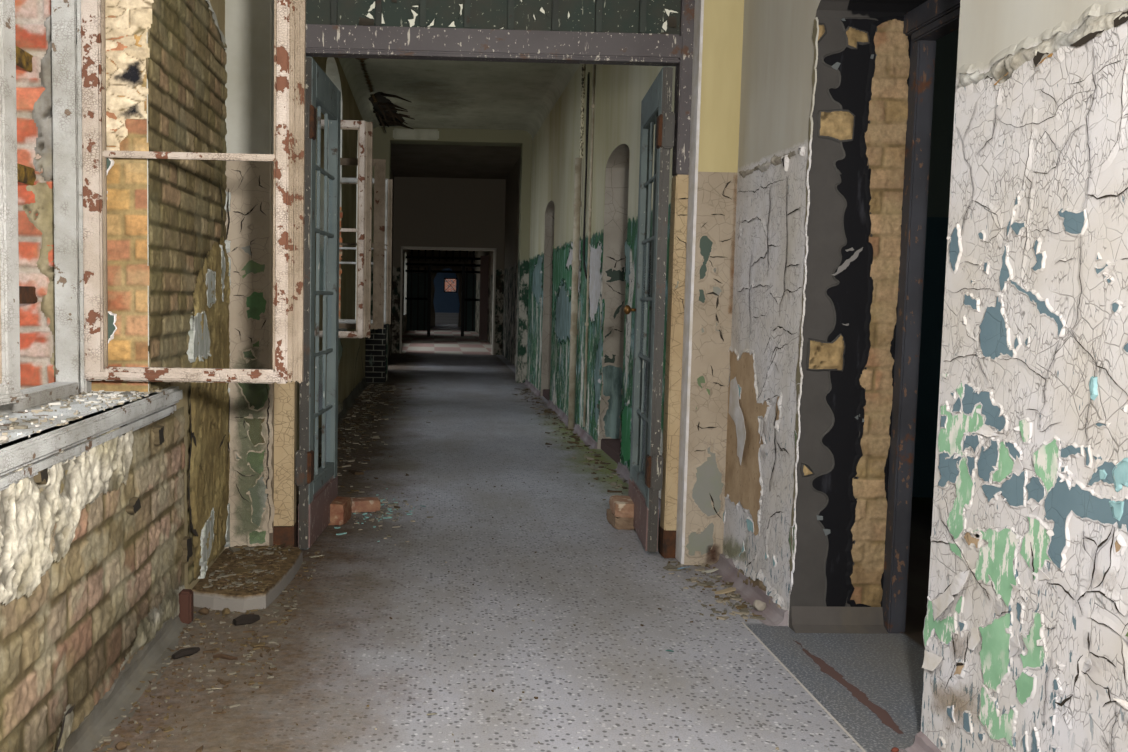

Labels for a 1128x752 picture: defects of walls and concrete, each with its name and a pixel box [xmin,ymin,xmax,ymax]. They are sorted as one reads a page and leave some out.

peeling [359,0,397,26]
peeling [406,3,464,28]
peeling [955,0,1128,98]
peeling [187,240,270,363]
peeling [531,238,632,466]
crack [675,178,802,570]
peeling [684,16,904,610]
peeling [962,191,1067,362]
crack [943,43,1128,445]
peeling [1057,207,1088,237]
peeling [228,383,273,547]
peeling [922,370,1128,752]